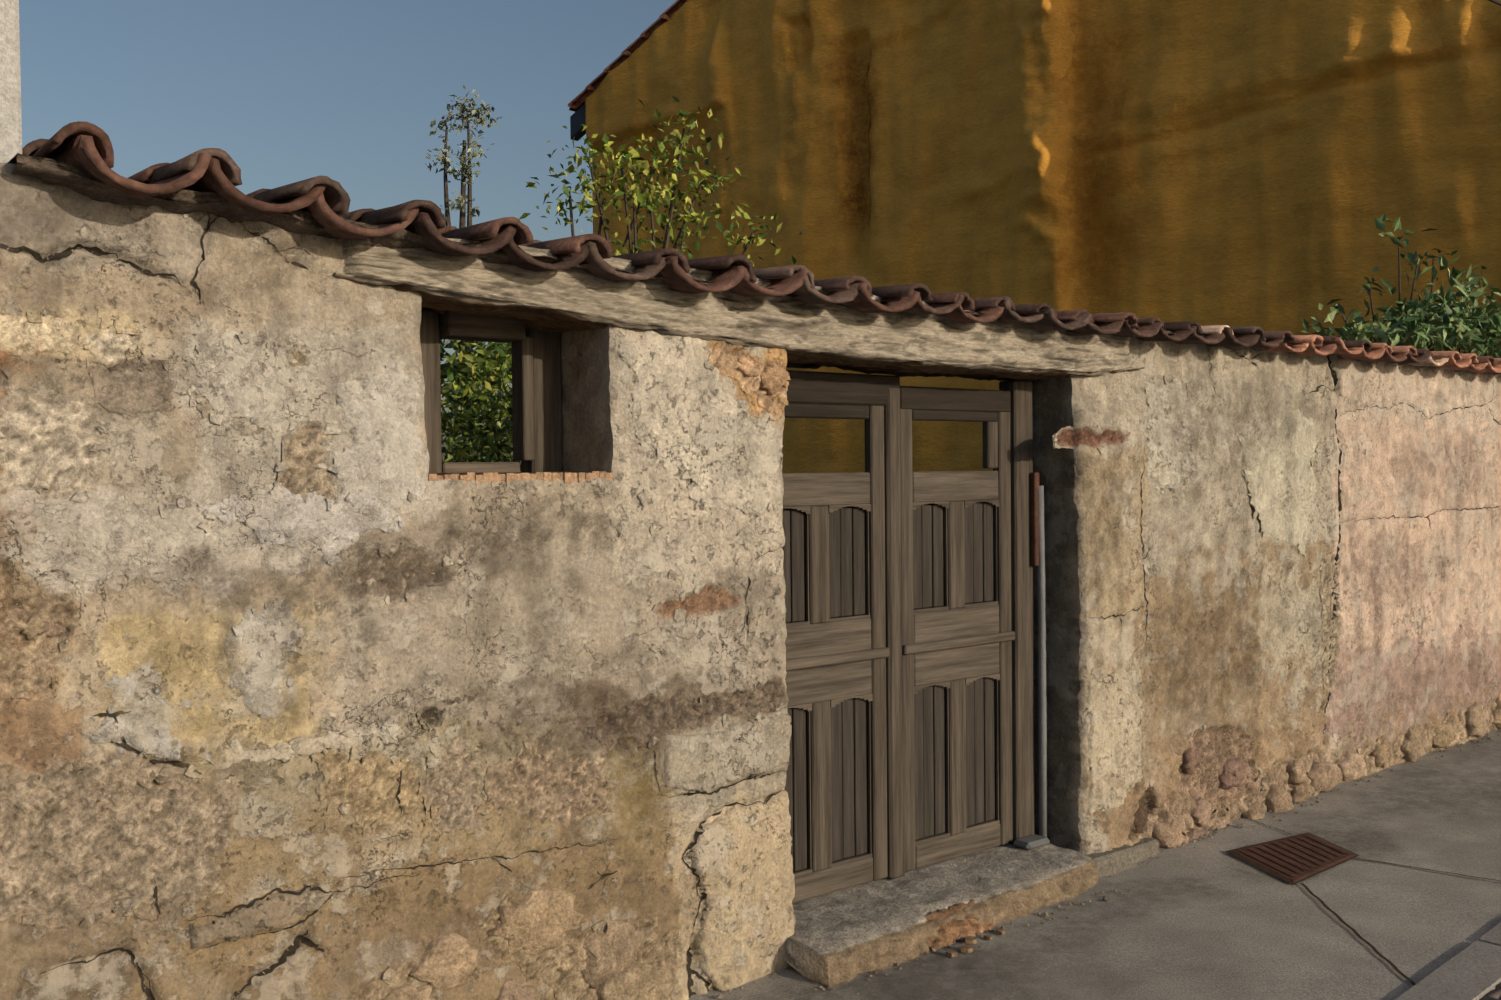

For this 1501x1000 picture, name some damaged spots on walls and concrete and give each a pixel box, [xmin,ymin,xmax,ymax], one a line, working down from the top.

crack [0,212,311,304]
flaking render [0,309,461,723]
flaking render [598,330,791,624]
flaking render [1052,375,1211,494]
crack [1310,355,1501,734]
crack [40,948,155,1000]
crack [152,839,618,1000]
spalling [0,666,792,949]
spalling [349,789,796,1000]
crack [653,736,786,997]